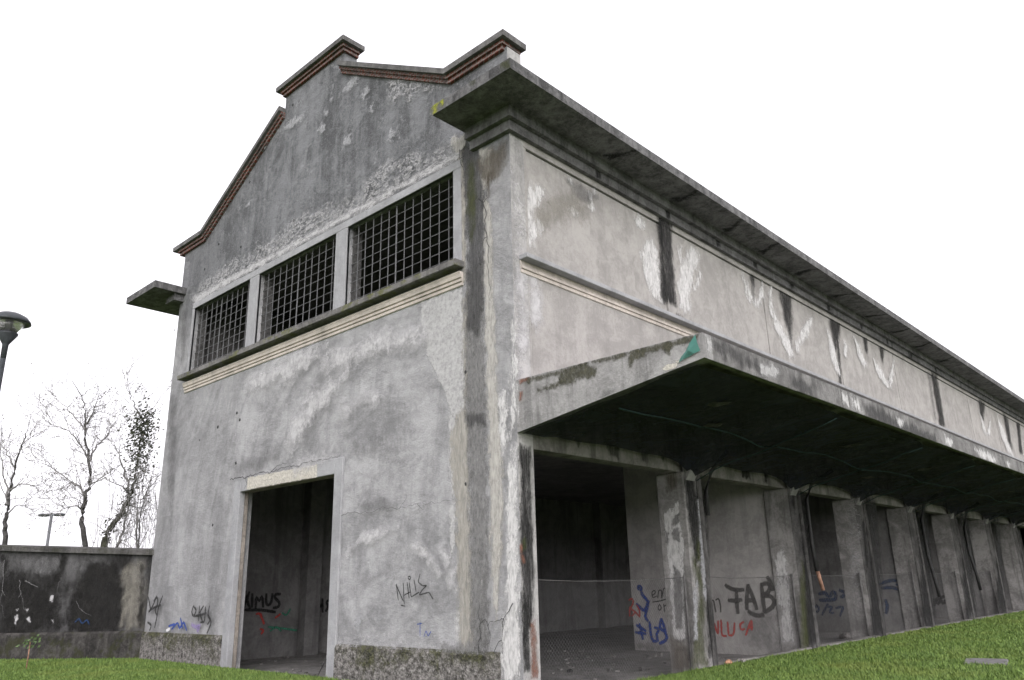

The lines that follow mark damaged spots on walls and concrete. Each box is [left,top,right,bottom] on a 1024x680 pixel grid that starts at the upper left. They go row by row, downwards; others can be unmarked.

water stain [639,190,701,316]
water stain [741,243,818,360]
water stain [441,143,507,655]
water stain [526,335,778,391]
water stain [827,294,953,447]
water stain [0,555,142,633]
crack [230,457,338,489]
water stain [519,446,535,672]
water stain [667,475,709,575]